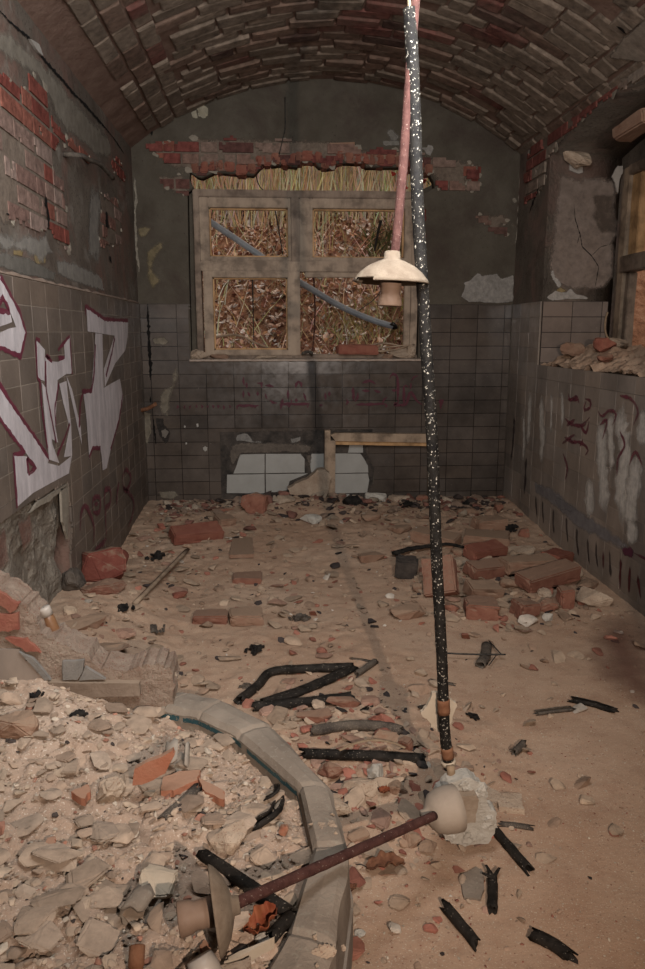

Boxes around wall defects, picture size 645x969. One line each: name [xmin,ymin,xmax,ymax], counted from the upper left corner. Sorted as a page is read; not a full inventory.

flaking render [28,39,43,56]
crack [0,11,123,152]
spalling [0,71,91,256]
spalling [146,135,410,196]
spalling [422,145,482,193]
spalling [523,64,645,205]
spalling [99,192,122,248]
peeling [547,271,588,301]
crack [574,210,607,289]
spalling [0,483,69,605]
spalling [0,589,106,702]